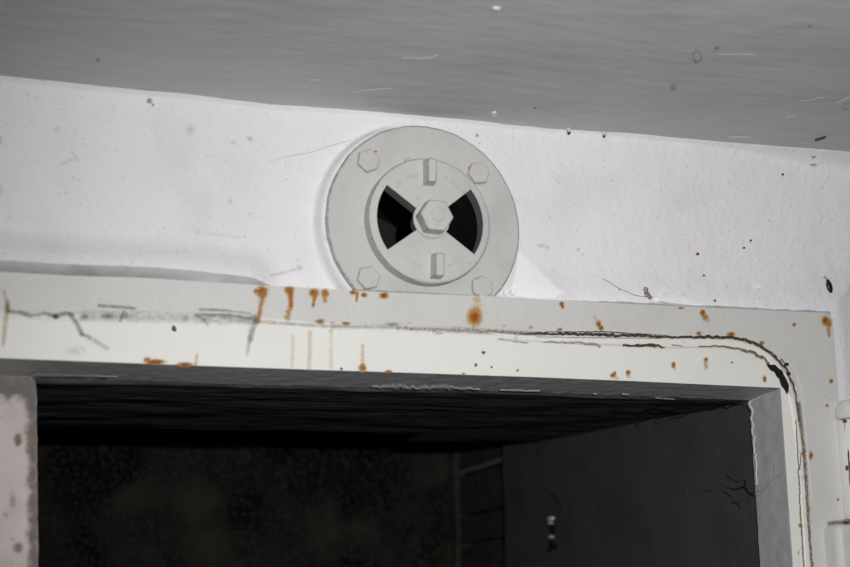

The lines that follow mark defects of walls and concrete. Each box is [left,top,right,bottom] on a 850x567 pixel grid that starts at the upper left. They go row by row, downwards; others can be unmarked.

corrosion [254,286,267,323]
corrosion [285,286,294,319]
corrosion [310,289,329,307]
corrosion [468,308,482,326]
crack [521,331,814,567]